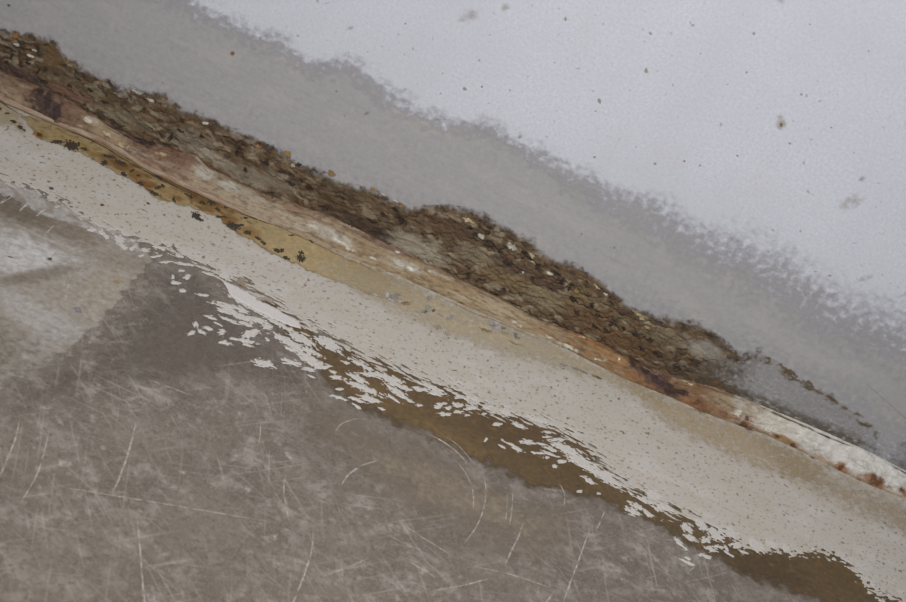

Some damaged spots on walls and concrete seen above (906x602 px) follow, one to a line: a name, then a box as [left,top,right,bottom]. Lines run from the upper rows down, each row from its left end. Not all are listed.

peeling [87,223,792,566]
damp [0,0,906,470]
damp [262,301,903,602]
corrosion [859,473,906,529]